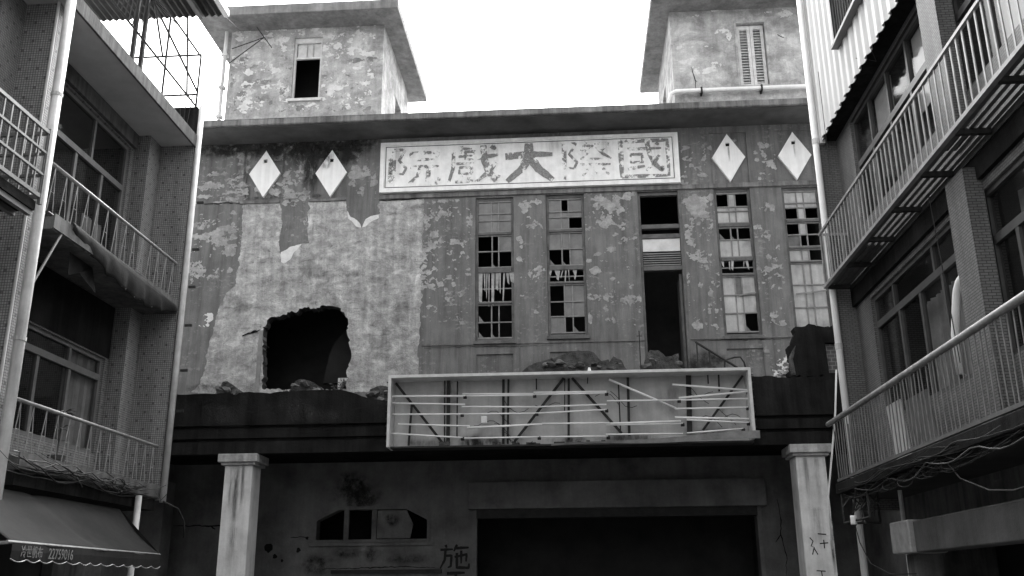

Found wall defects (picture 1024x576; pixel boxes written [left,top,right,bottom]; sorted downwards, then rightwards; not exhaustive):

peeling [228,25,376,114]
leakage [201,139,375,184]
peeling [753,142,777,187]
flaking render [189,144,473,394]
peeling [584,191,642,325]
peeling [680,141,722,331]
peeling [753,202,789,326]